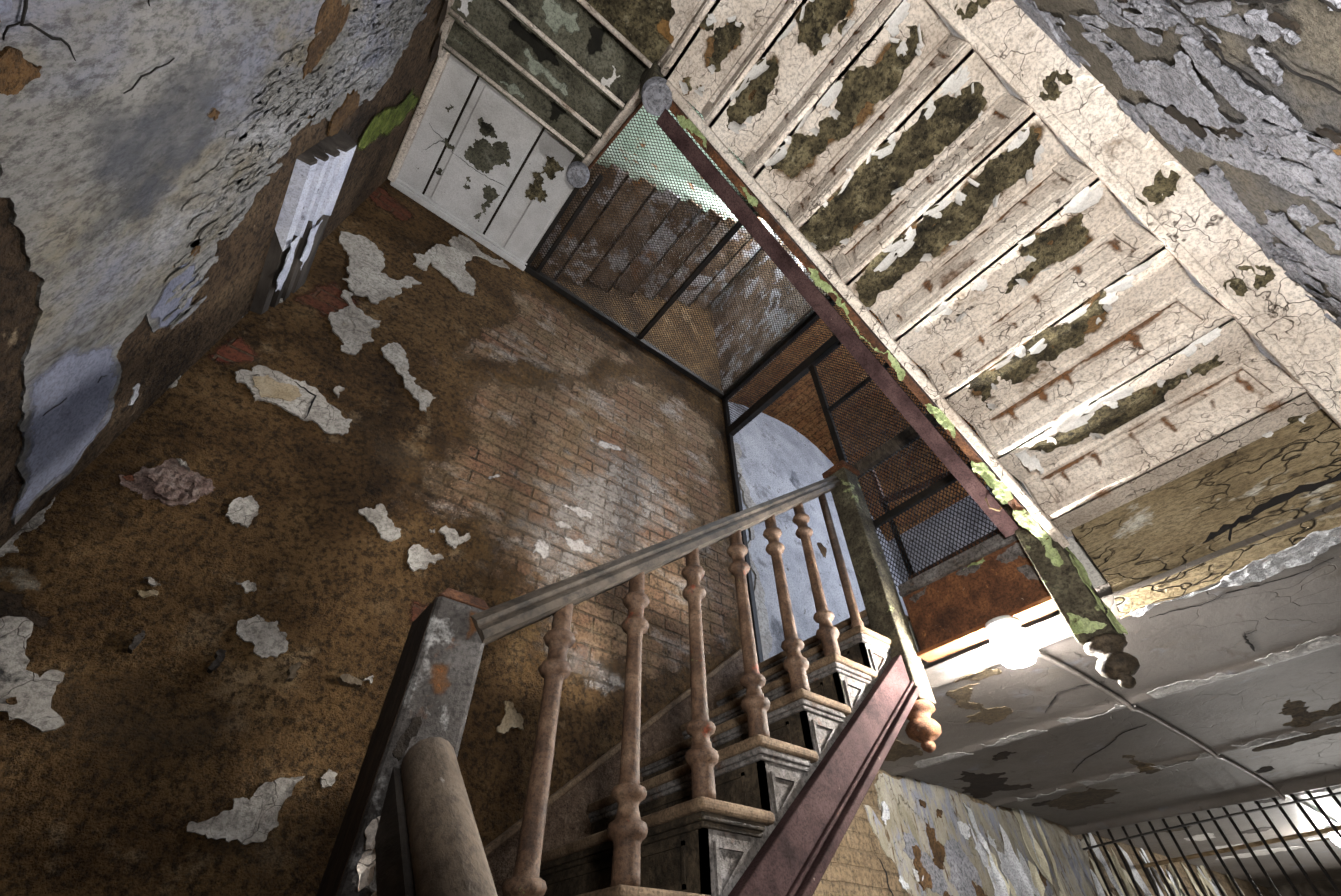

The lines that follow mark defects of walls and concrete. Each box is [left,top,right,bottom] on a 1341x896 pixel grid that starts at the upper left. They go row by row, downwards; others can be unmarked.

crack [2,0,76,61]
crack [123,58,175,94]
peeling [768,23,925,179]
crack [943,0,1007,50]
crack [1020,60,1203,221]
peeling [1005,0,1341,329]
crack [1169,0,1341,95]
peeling [0,0,448,557]
flaking render [328,231,510,412]
peeling [968,289,1112,411]
crack [1204,224,1341,408]
peeling [863,700,1341,896]